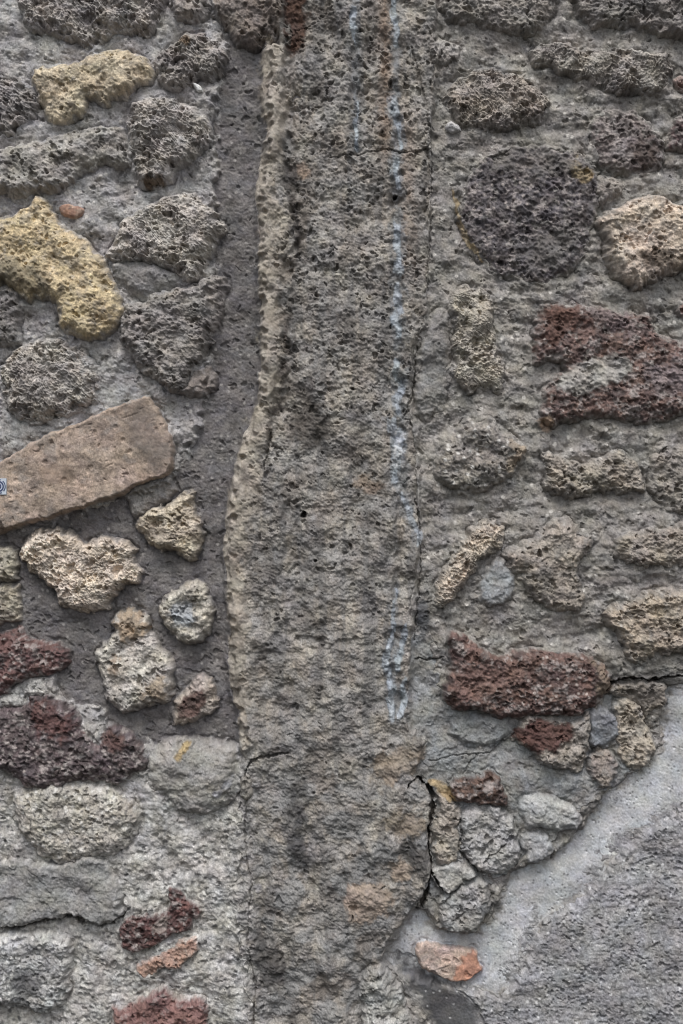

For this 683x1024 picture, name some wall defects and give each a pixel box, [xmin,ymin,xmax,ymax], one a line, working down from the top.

crack [407,775,442,905]